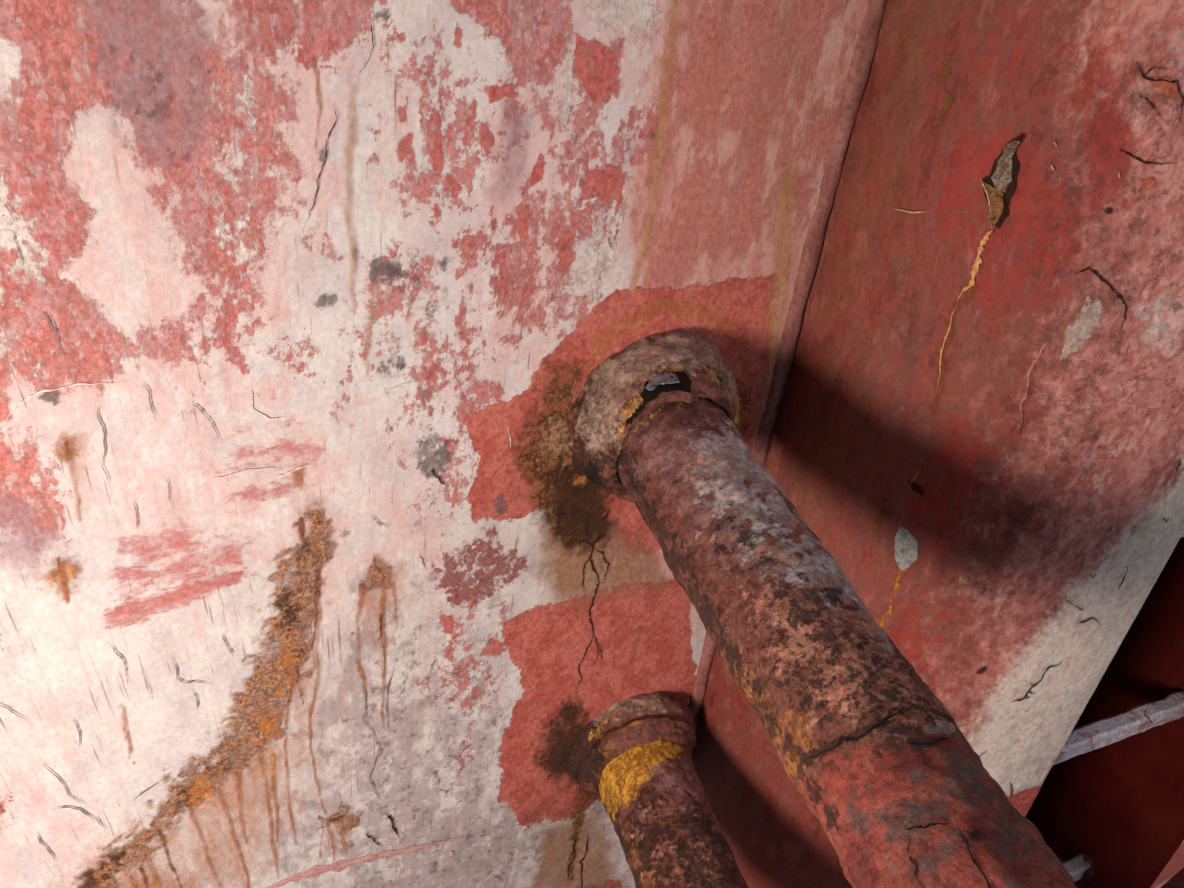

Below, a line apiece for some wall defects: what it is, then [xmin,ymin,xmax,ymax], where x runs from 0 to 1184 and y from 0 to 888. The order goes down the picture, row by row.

peeling [981,140,1020,234]
peeling [1059,296,1104,360]
crack [1074,267,1127,335]
peeling [0,0,778,827]
rust [511,361,613,552]
rust [358,556,395,679]
crack [576,509,610,691]
peeling [894,526,918,570]
rust [77,505,361,888]